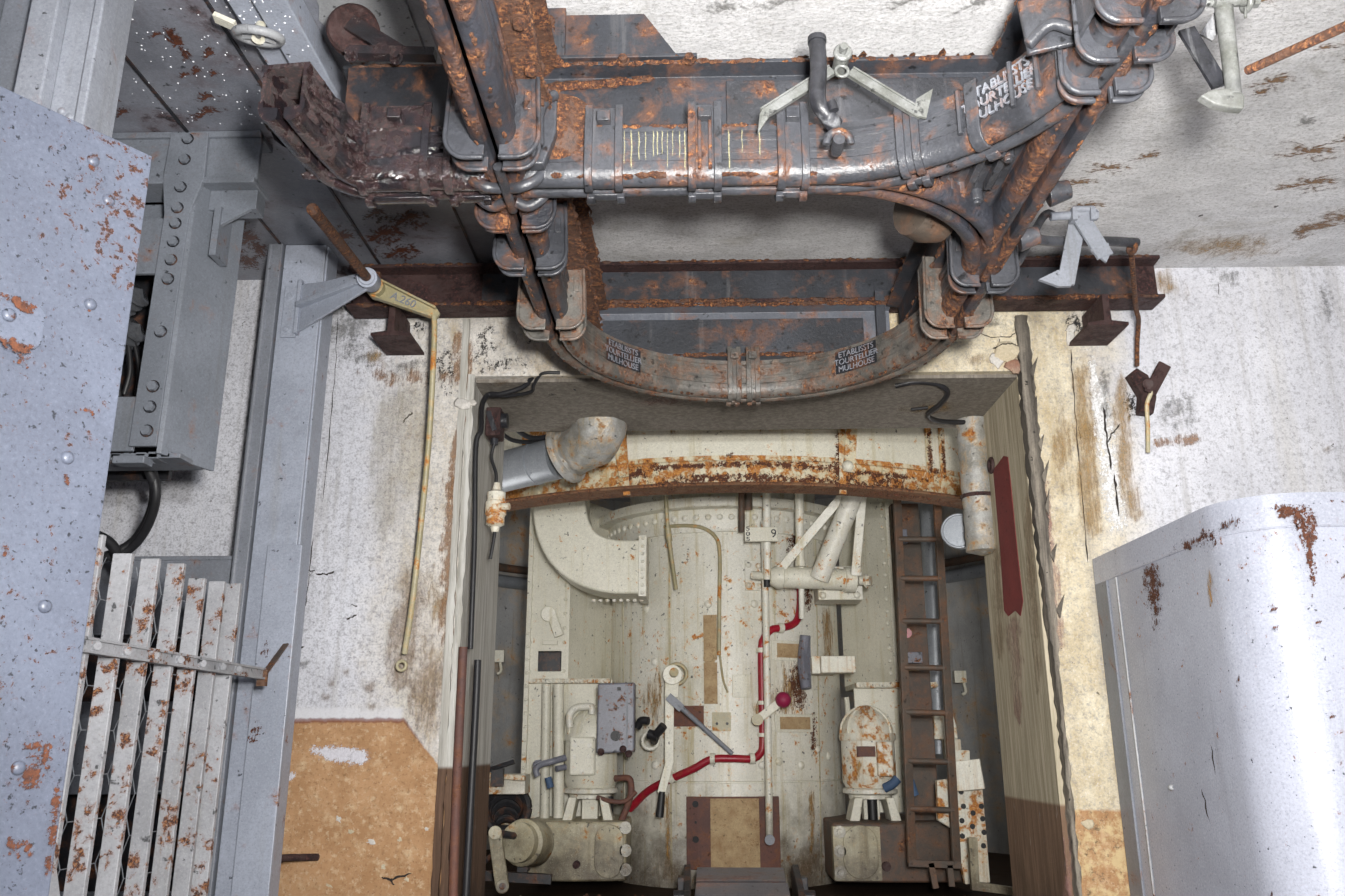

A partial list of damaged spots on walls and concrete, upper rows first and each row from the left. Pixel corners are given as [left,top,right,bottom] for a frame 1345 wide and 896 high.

corrosion [1251,72,1291,94]
corrosion [1274,134,1345,194]
corrosion [240,222,268,270]
corrosion [329,208,430,263]
corrosion [1295,210,1345,239]
corrosion [371,332,472,387]
corrosion [610,430,947,501]
water stain [1053,356,1141,533]
corrosion [438,417,466,641]